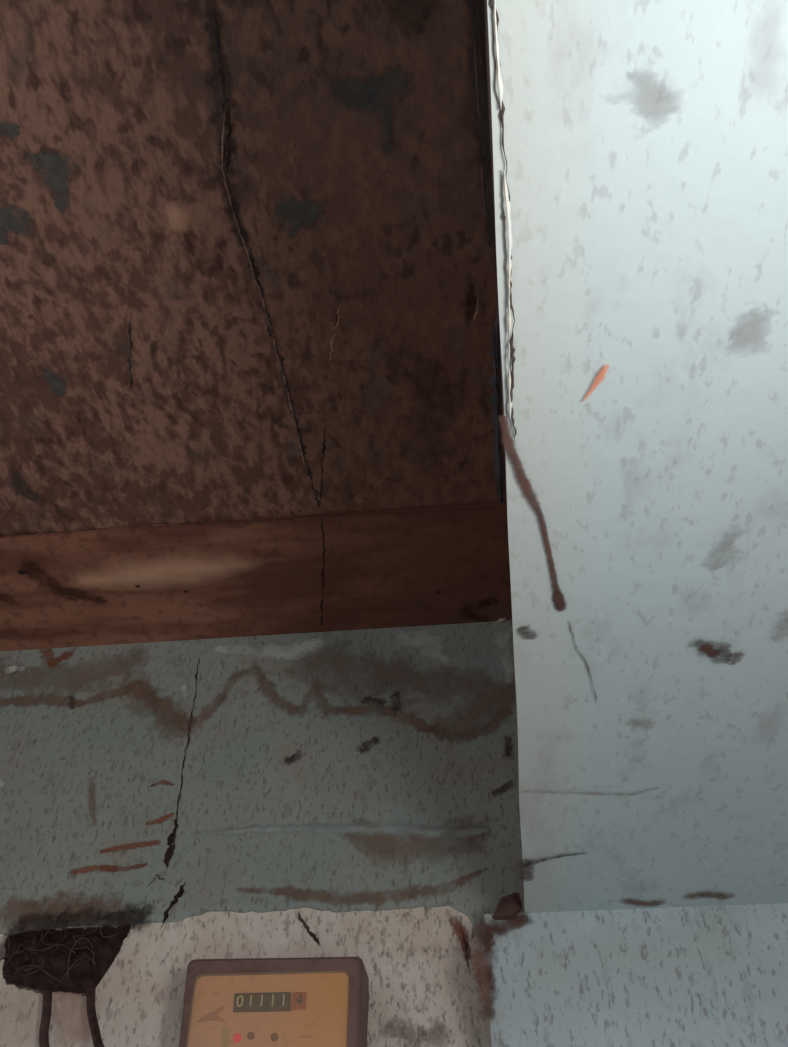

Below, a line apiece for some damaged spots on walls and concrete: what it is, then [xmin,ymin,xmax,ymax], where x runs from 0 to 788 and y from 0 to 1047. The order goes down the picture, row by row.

peeling [29,151,71,212]
crack [490,0,517,443]
crack [7,8,494,625]
corrosion [499,415,566,611]
leakage [0,654,228,731]
leakage [258,670,305,714]
leakage [307,652,514,739]
crack [148,659,200,929]
leakage [7,893,119,924]
corrosion [450,914,529,1018]